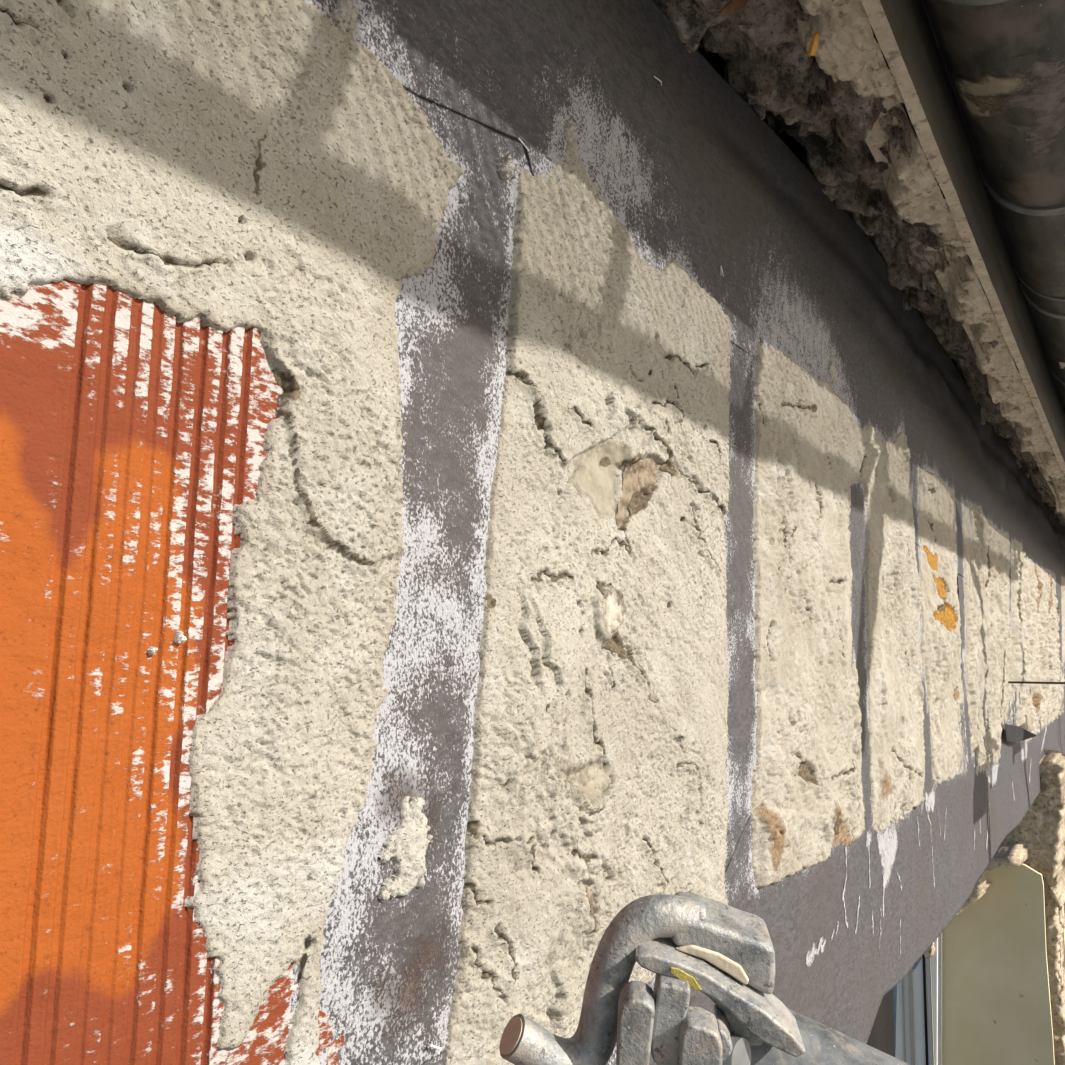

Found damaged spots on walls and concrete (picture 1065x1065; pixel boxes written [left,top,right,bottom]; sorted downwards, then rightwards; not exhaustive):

crack [0,10,28,25]
crack [0,184,46,203]
spalling [600,453,679,530]
water stain [391,781,429,820]